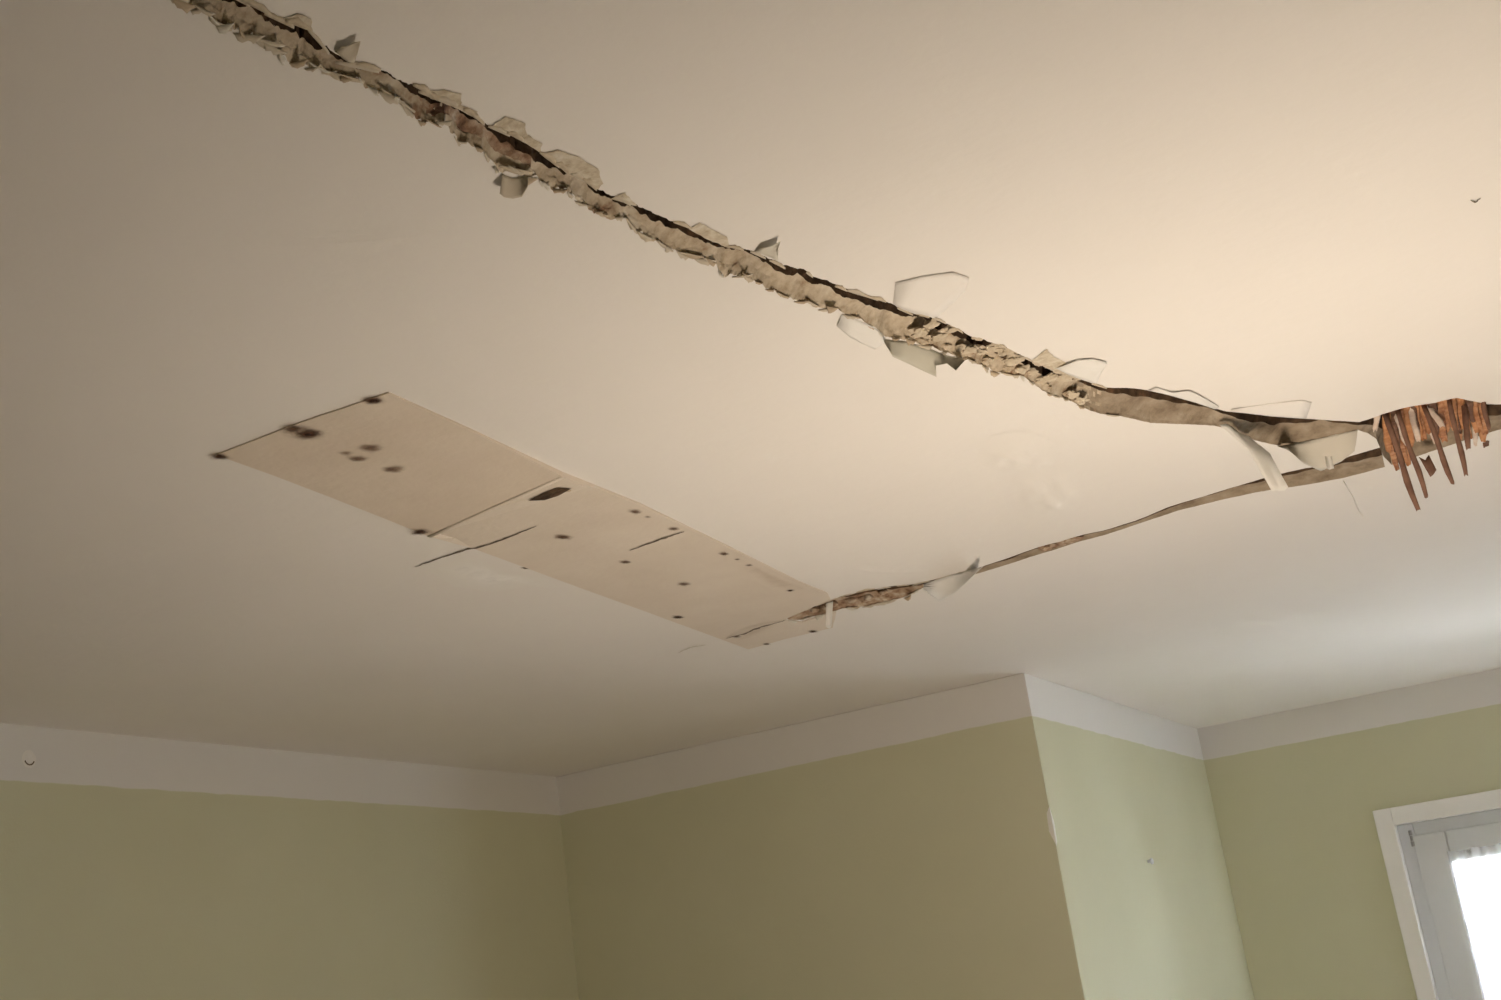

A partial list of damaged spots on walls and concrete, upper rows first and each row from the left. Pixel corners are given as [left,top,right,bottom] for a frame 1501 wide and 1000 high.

peeling [499,174,528,199]
crack [171,0,1501,638]
peeling [837,315,966,377]
peeling [893,272,969,317]
peeling [1055,359,1107,384]
peeling [1147,387,1358,491]